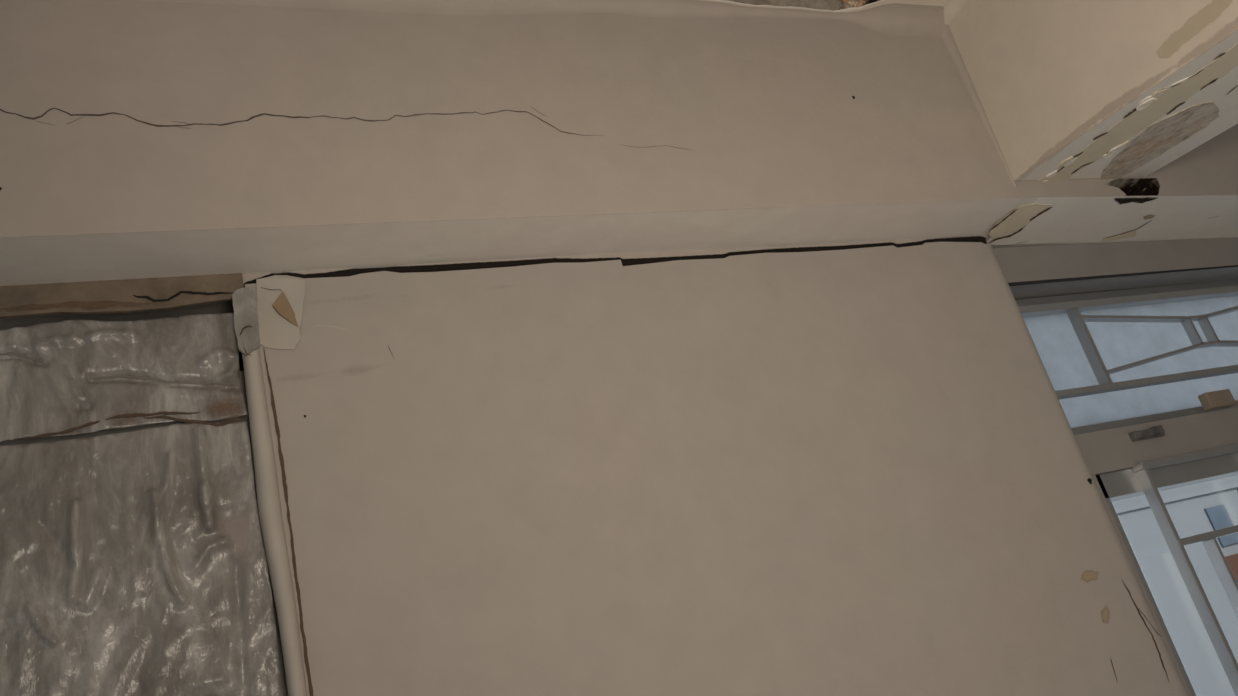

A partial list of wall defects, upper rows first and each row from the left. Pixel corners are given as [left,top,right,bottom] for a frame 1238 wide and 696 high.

spalling [712,0,883,12]
crack [0,106,693,151]
peeling [1017,31,1238,242]
peeling [989,204,1052,243]
crack [133,235,987,302]